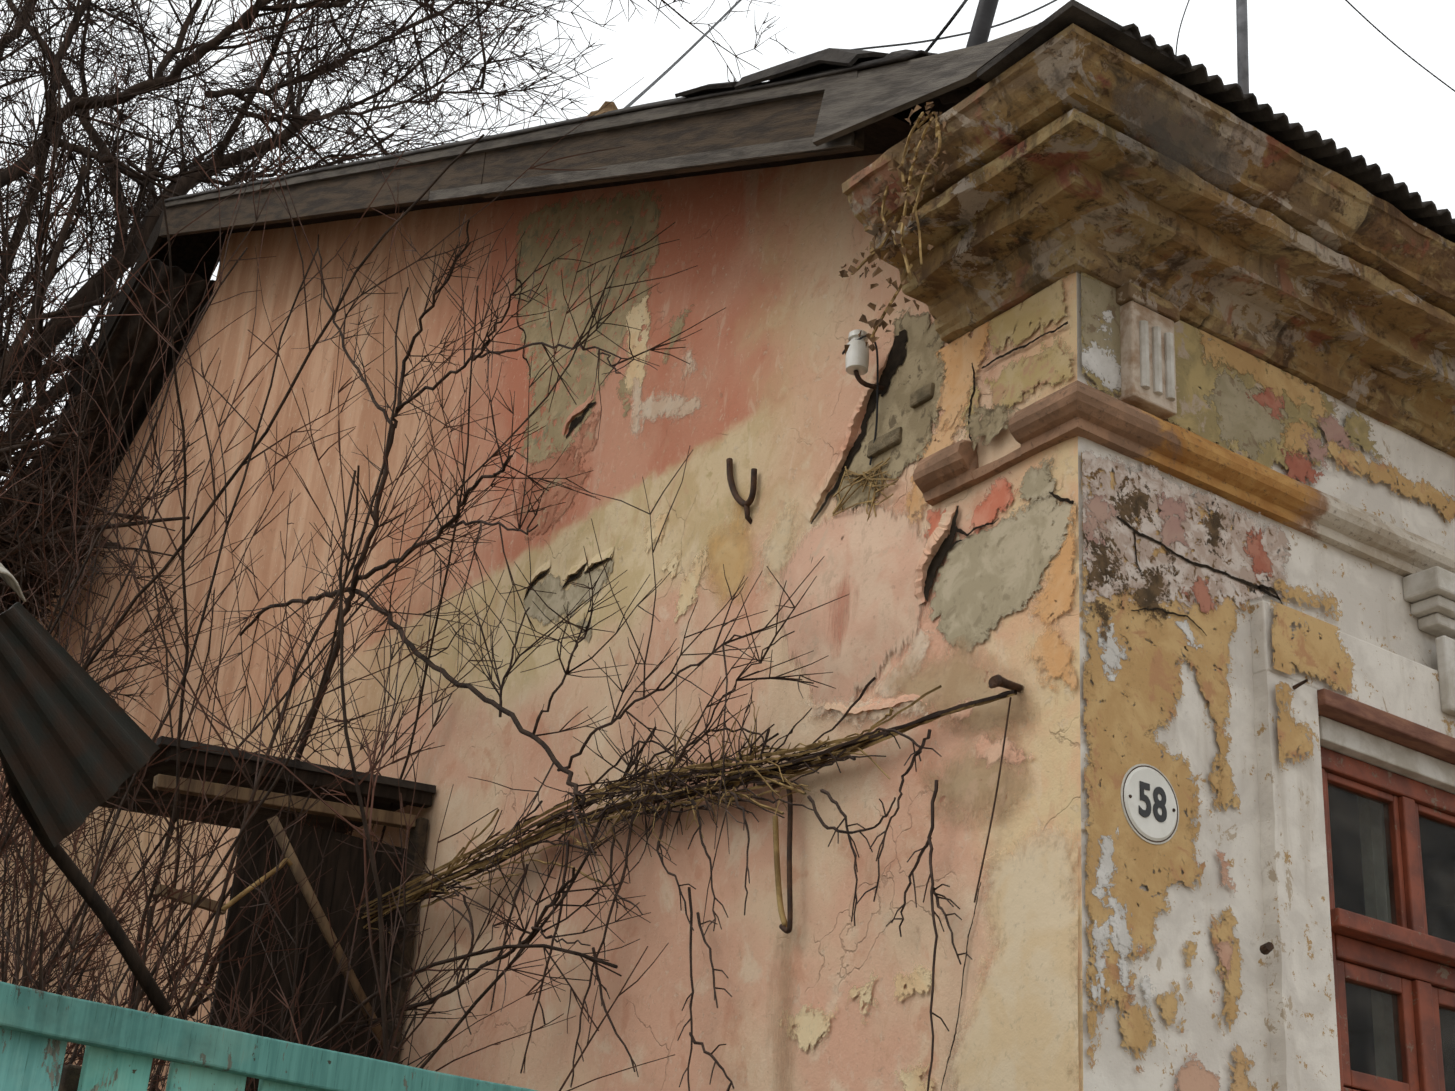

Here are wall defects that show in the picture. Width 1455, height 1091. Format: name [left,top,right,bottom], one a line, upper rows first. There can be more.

flaking render [762,271,1455,583]
crack [914,506,999,605]
damp [1082,450,1292,643]
crack [1117,516,1282,636]
peeling [929,452,1358,1091]
peeling [779,965,935,1051]
peeling [894,1062,935,1091]